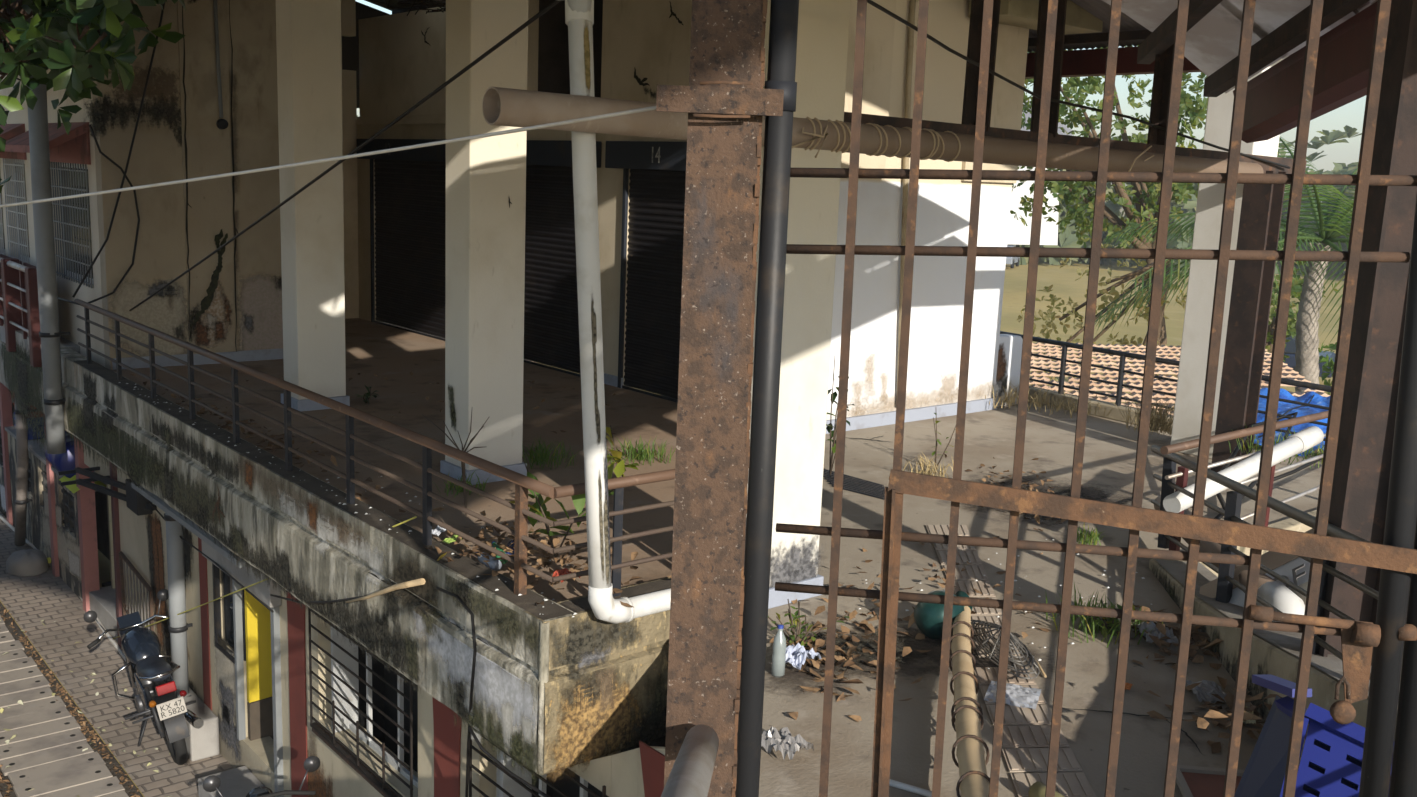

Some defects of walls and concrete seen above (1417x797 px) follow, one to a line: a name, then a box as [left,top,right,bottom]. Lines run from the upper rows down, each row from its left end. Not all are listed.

water stain [85,68,182,146]
water stain [83,373,117,432]
water stain [128,415,667,778]
water stain [448,385,456,430]
water stain [591,298,611,584]
rust [732,115,762,797]